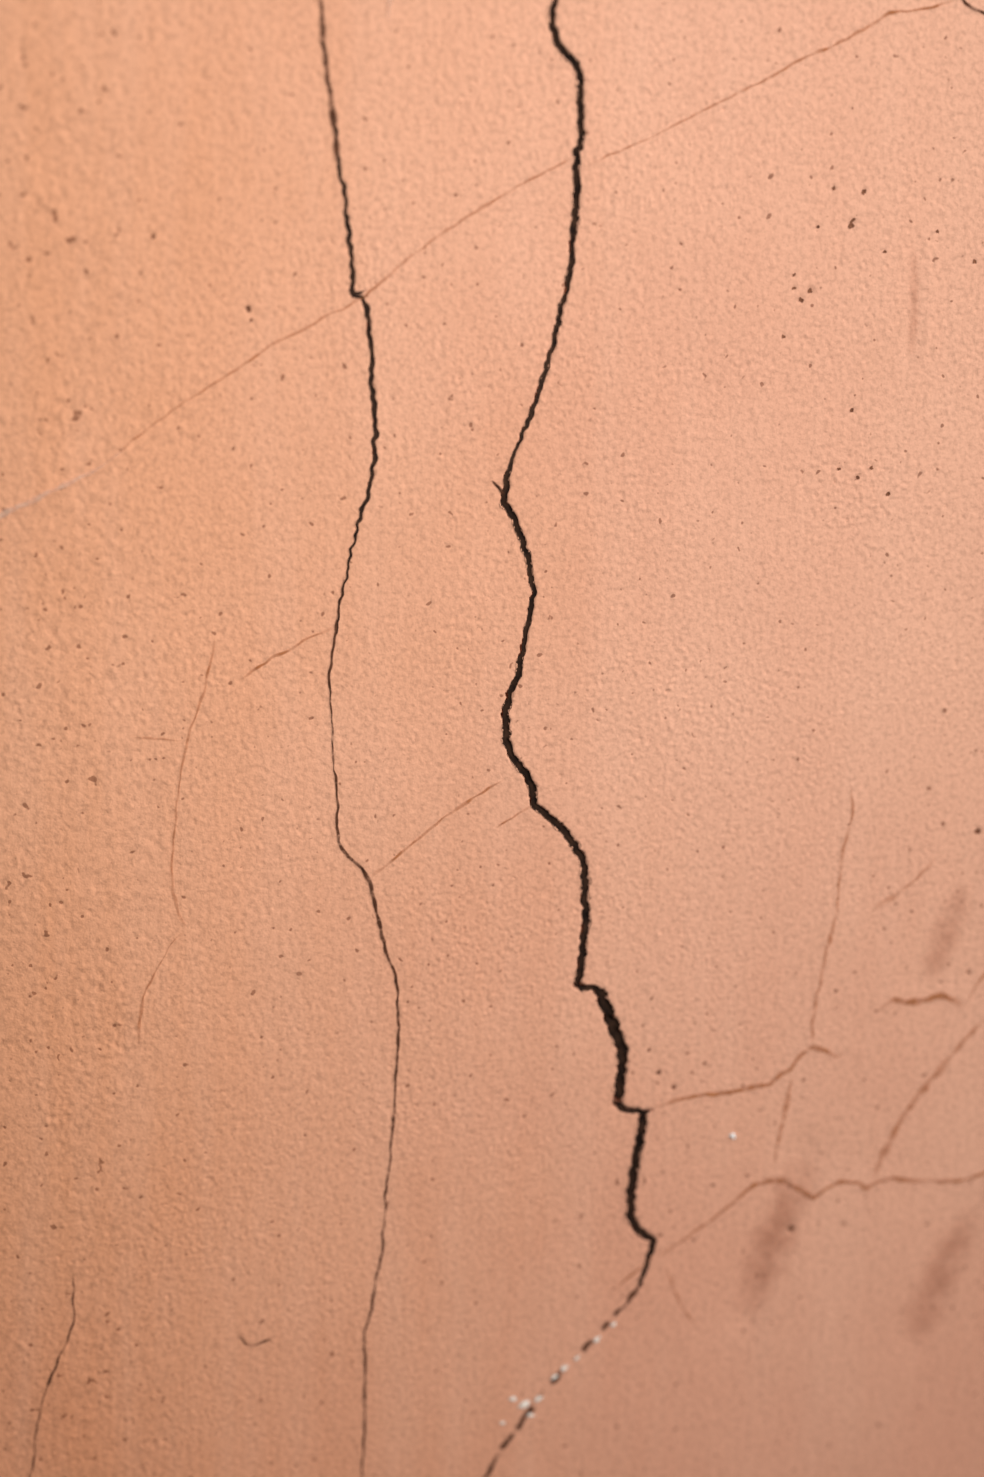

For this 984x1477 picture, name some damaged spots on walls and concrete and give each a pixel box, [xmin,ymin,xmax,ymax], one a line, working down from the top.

crack [886,0,984,15]
crack [255,0,908,1477]
crack [893,993,951,1004]
crack [30,1277,75,1477]